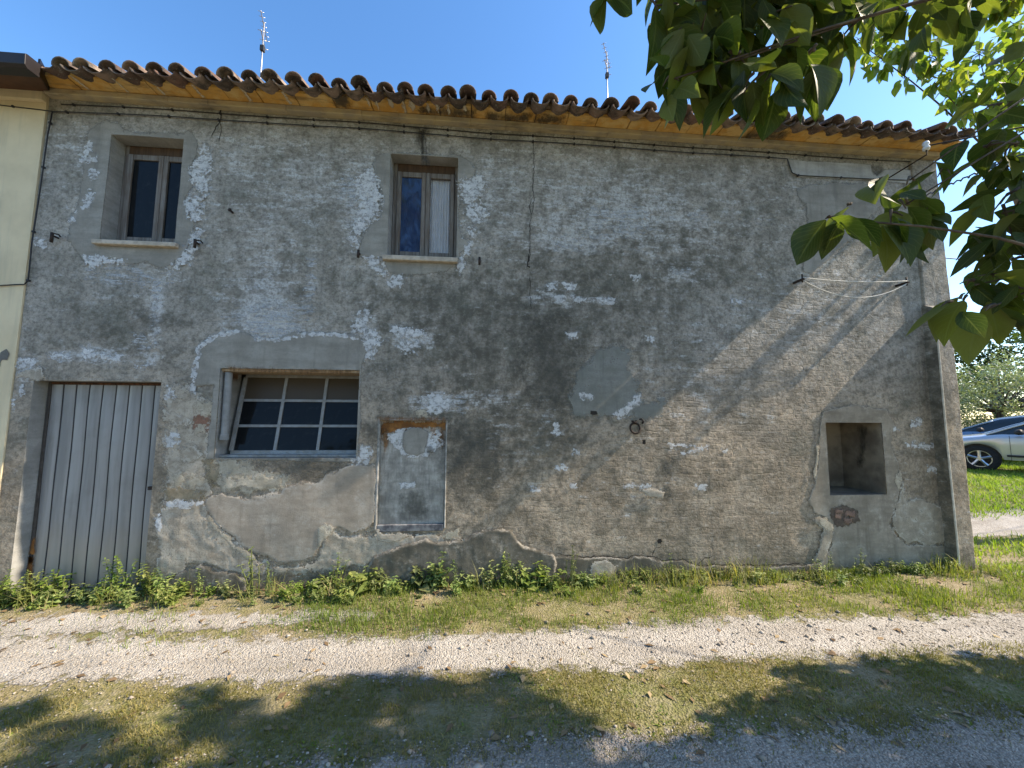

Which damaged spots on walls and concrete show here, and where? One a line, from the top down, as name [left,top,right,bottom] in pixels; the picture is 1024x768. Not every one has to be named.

peeling [67,140,100,224]
peeling [83,142,213,320]
peeling [339,168,404,288]
peeling [455,174,490,273]
crack [527,139,535,306]
peeling [254,309,427,360]
peeling [546,282,616,305]
spalling [154,329,464,581]
peeling [613,394,642,420]
spalling [812,505,860,562]